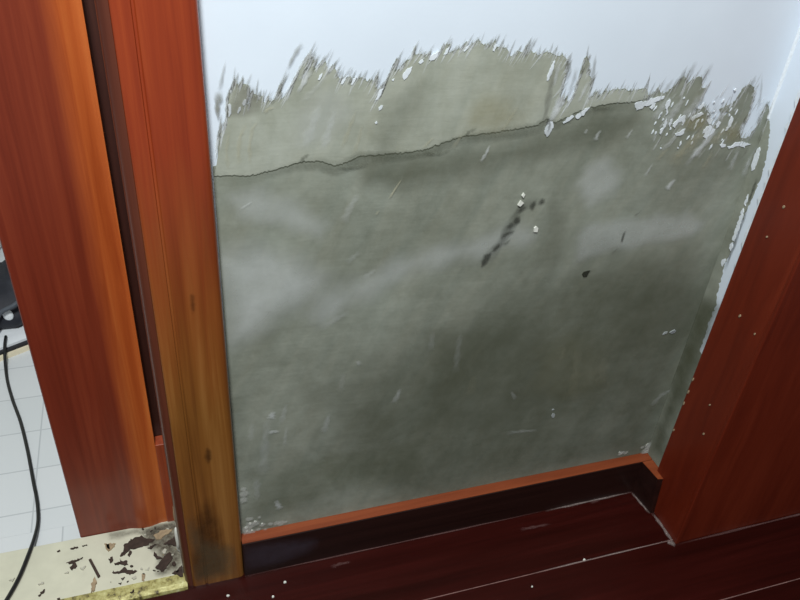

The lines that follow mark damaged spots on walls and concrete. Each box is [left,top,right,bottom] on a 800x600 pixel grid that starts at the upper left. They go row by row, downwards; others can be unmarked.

peeling [213,39,770,534]
water stain [674,306,713,398]
peeling [64,544,87,574]
peeling [104,508,183,594]